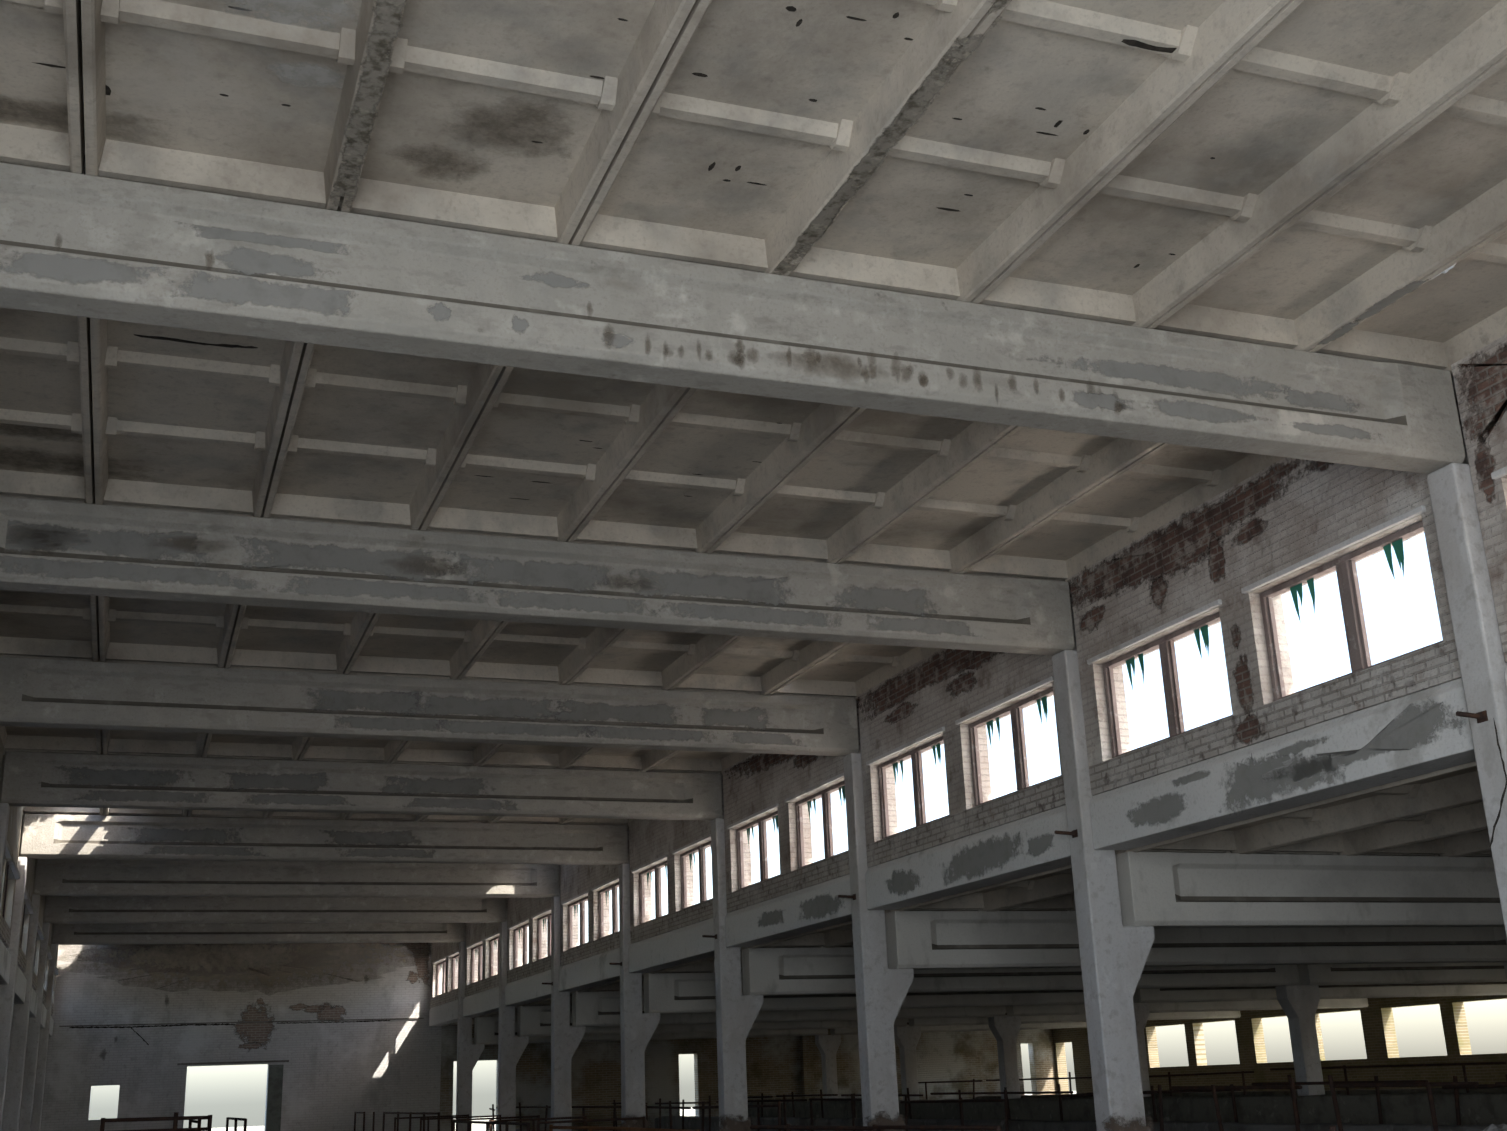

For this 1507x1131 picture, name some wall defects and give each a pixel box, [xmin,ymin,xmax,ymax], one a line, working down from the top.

spalling [330,0,406,210]
spalling [708,162,765,185]
spalling [774,35,985,275]
peeling [1457,344,1507,503]
peeling [1067,459,1334,631]
peeling [857,649,1004,723]
peeling [727,753,818,779]
peeling [234,998,275,1050]
peeling [290,1003,346,1023]